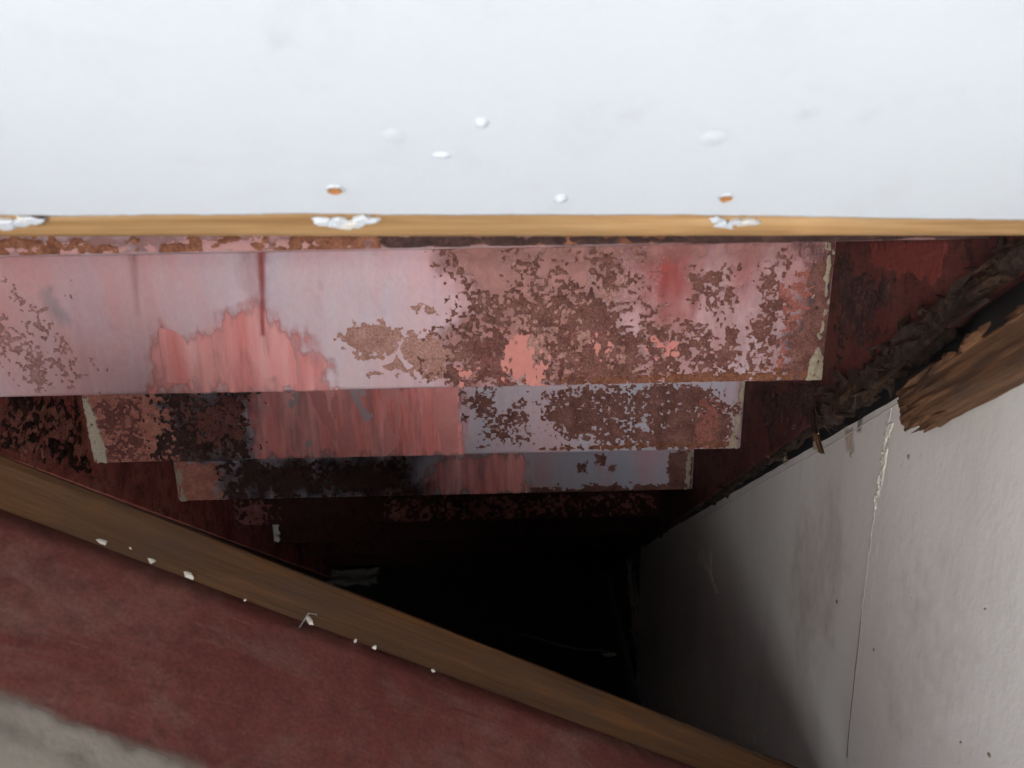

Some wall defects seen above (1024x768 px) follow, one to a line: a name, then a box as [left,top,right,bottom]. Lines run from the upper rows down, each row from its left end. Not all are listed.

peeling [147,302,528,495]
corrosion [0,235,990,525]
peeling [501,330,551,386]
peeling [588,332,613,361]
peeling [645,335,680,361]
crack [846,408,894,758]